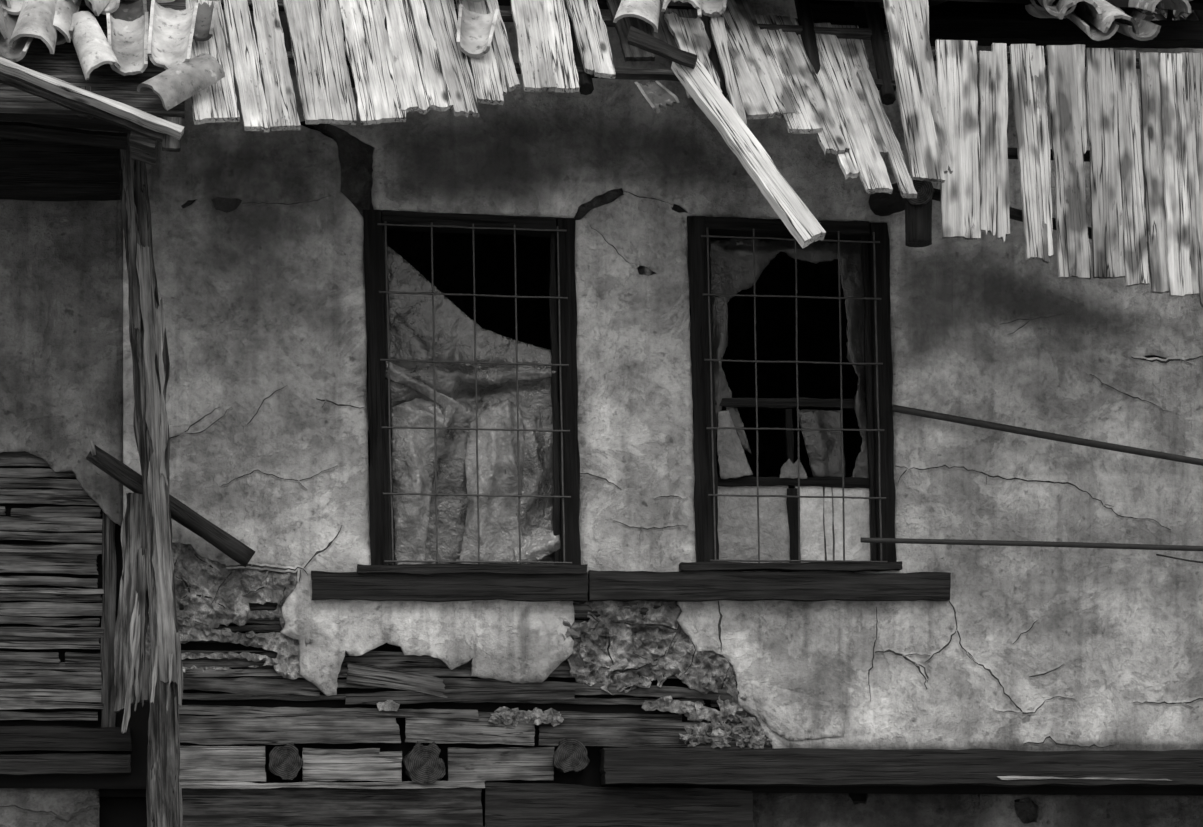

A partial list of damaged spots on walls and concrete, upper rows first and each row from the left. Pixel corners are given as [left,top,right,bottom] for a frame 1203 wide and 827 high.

crack [1130,354,1203,366]
crack [169,384,288,442]
crack [316,396,365,410]
crack [1089,372,1168,413]
crack [219,464,338,491]
crack [895,462,1171,531]
crack [226,524,344,582]
spalling [172,543,312,679]
spalling [562,595,772,749]
crack [866,597,1111,750]
spalling [376,700,400,711]
spalling [489,706,564,727]